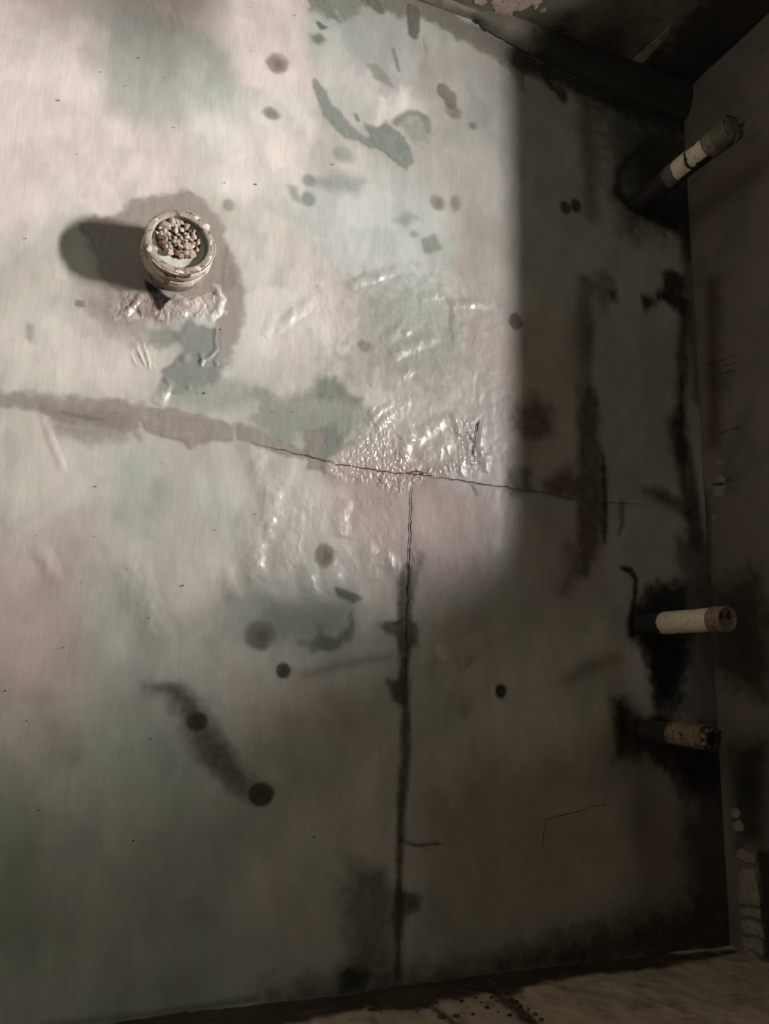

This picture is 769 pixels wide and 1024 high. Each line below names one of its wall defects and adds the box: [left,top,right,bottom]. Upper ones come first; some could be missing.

damp [0,192,369,469]
damp [310,0,769,729]
crack [252,370,686,705]
damp [159,687,273,806]
spalling [735,848,765,959]